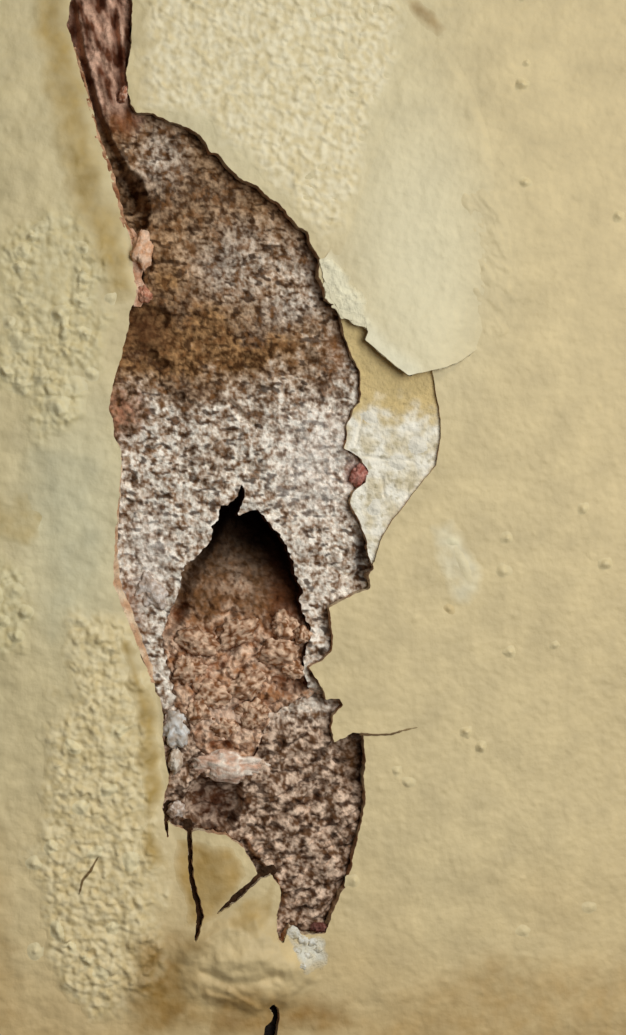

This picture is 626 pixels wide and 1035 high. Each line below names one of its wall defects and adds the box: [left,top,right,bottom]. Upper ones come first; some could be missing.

flaking render [19,0,495,1024]
crack [360,727,417,736]
crack [162,801,276,938]
leakage [0,635,626,1035]
crack [264,1005,278,1035]